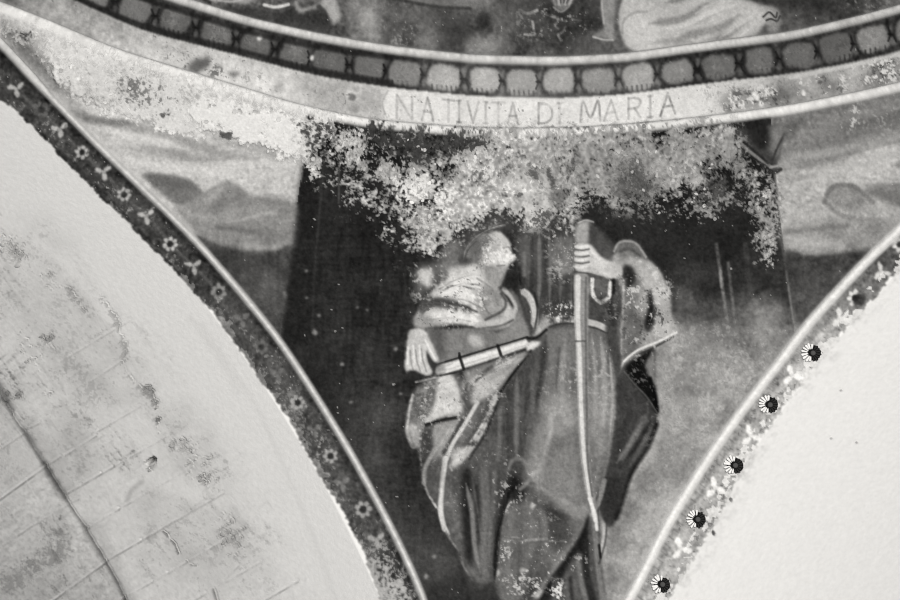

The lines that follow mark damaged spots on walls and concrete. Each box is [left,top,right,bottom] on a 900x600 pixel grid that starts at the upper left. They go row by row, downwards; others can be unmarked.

peeling [0,19,784,267]
crack [0,388,126,600]